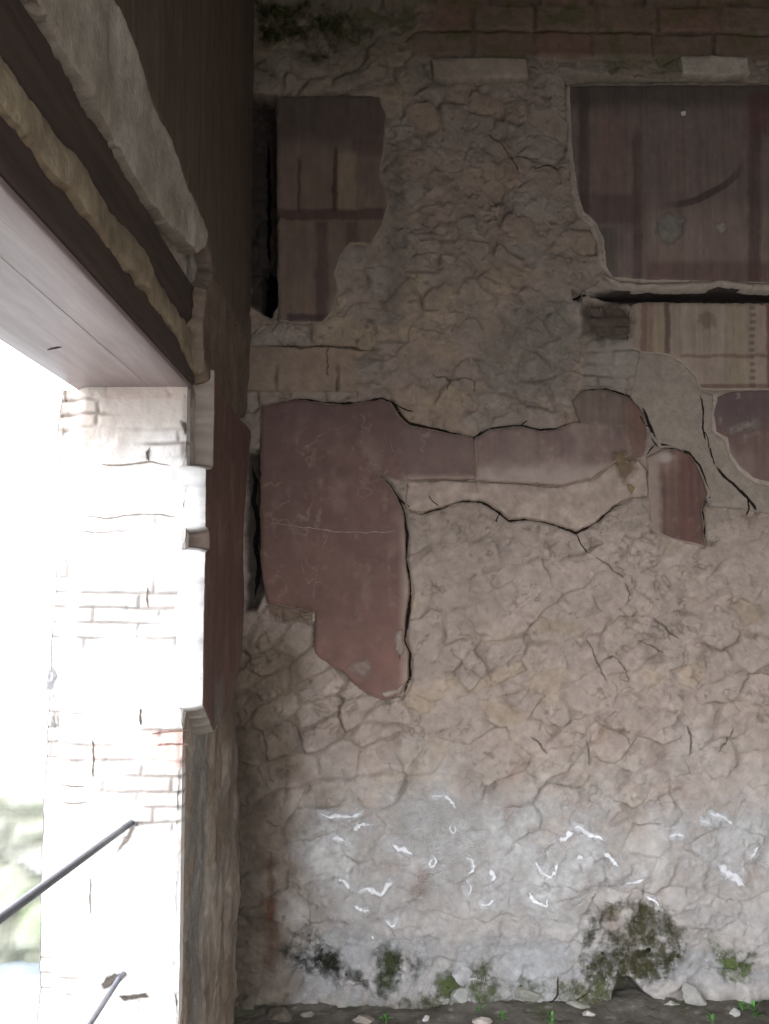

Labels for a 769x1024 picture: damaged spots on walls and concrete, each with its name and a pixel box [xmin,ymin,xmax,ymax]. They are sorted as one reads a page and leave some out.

crack [489,135,559,170]
spalling [572,161,769,296]
spalling [582,304,632,340]
crack [290,397,569,439]
spalling [405,452,648,532]
crack [589,389,757,539]
crack [251,465,630,699]
peeling [395,630,405,655]
leakage [666,810,769,886]
leakage [299,794,725,1002]
crack [549,979,589,1003]